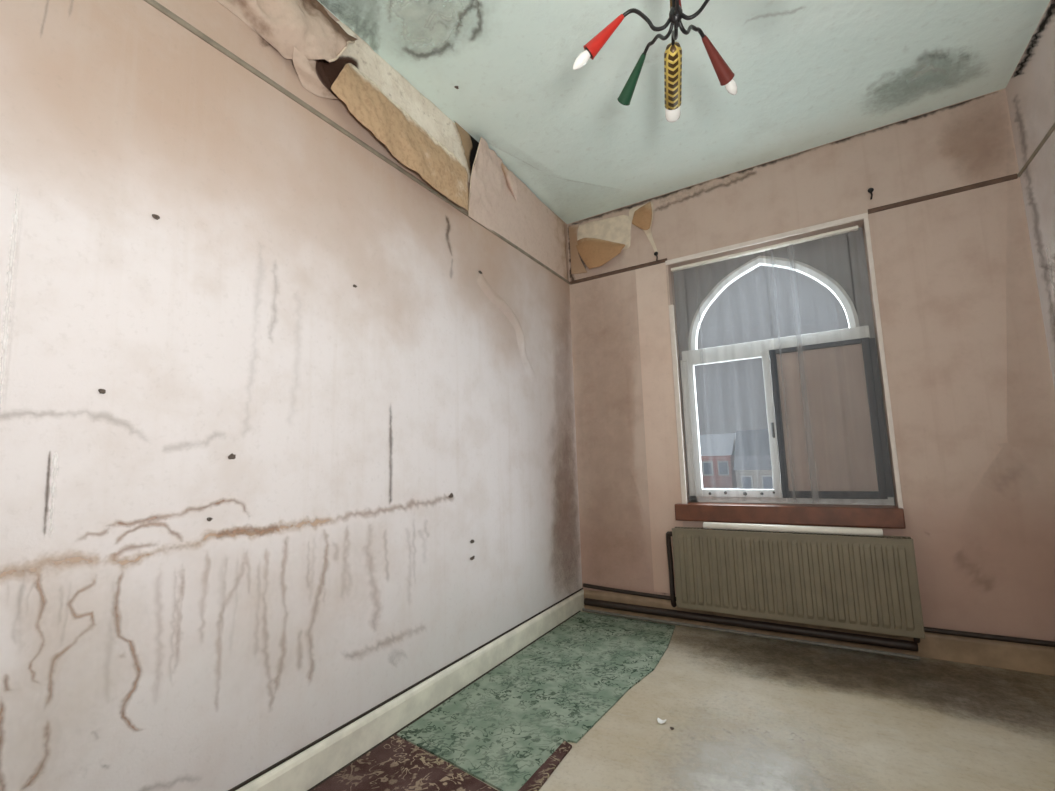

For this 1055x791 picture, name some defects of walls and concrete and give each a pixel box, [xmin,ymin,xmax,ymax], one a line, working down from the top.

flaking render [316,21,479,183]
flaking render [577,202,658,252]
damp [204,520,329,539]
damp [115,592,140,730]